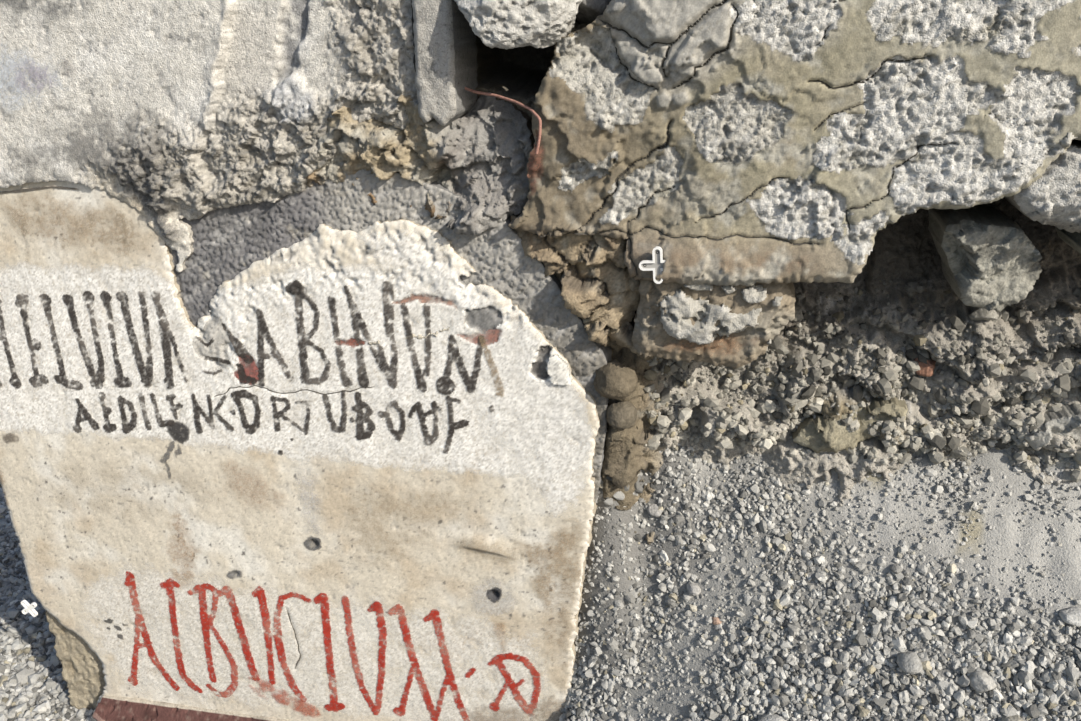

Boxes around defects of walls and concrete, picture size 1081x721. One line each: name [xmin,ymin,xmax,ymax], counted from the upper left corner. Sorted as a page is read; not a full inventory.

crack [599,0,739,90]
flaking render [683,83,793,166]
crack [809,57,925,131]
flaking render [729,0,1081,265]
crack [0,186,77,194]
crack [532,122,817,277]
crack [846,143,956,231]
flaking render [193,316,231,368]
flaking render [336,338,379,347]
flaking render [393,294,503,345]
flaking render [531,346,572,386]